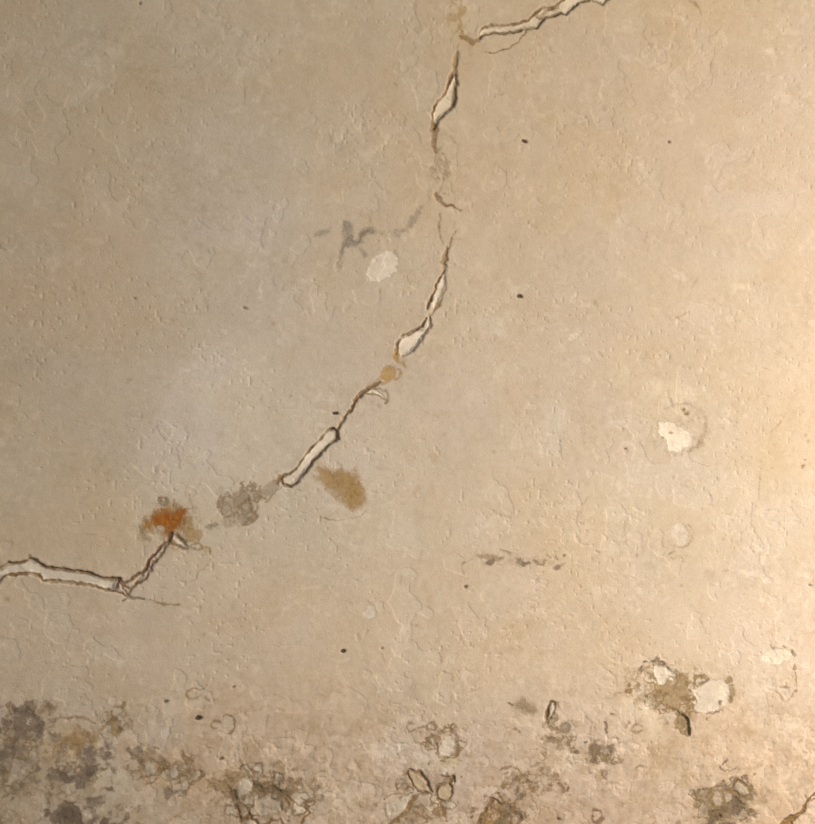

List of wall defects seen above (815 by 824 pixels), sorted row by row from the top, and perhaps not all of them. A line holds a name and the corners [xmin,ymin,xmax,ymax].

crack [459,0,608,53]
crack [431,59,458,153]
crack [279,226,452,488]
spalling [658,421,694,452]
rust [142,497,197,542]
crack [0,532,186,600]
spalling [639,657,734,737]
water stain [0,701,126,795]
water stain [62,787,113,824]
spalling [207,763,321,824]
spalling [384,771,462,824]
spalling [689,774,757,824]